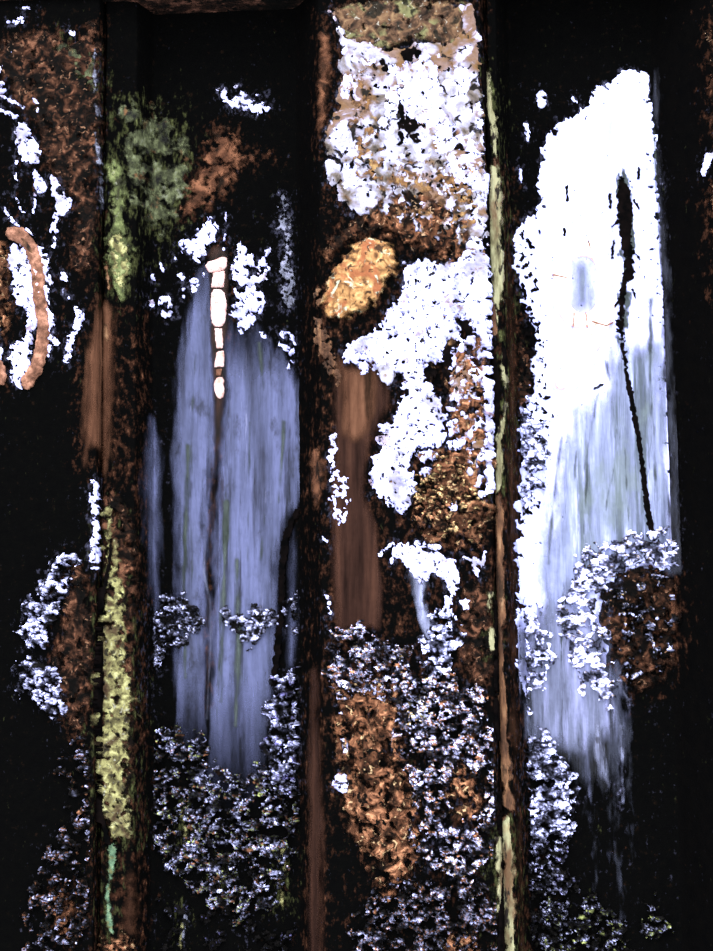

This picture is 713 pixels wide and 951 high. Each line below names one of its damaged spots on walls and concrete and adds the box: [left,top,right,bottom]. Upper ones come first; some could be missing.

corrosion [0,241,10,326]
peeling [0,65,85,390]
corrosion [0,20,105,271]
peeling [148,212,227,319]
peeling [229,195,295,339]
peeling [278,331,296,370]
corrosion [310,69,482,629]
peeling [325,3,496,526]
peeling [512,69,672,696]
peeling [700,153,713,177]
corrosion [308,669,420,951]
corrosion [445,933,472,951]